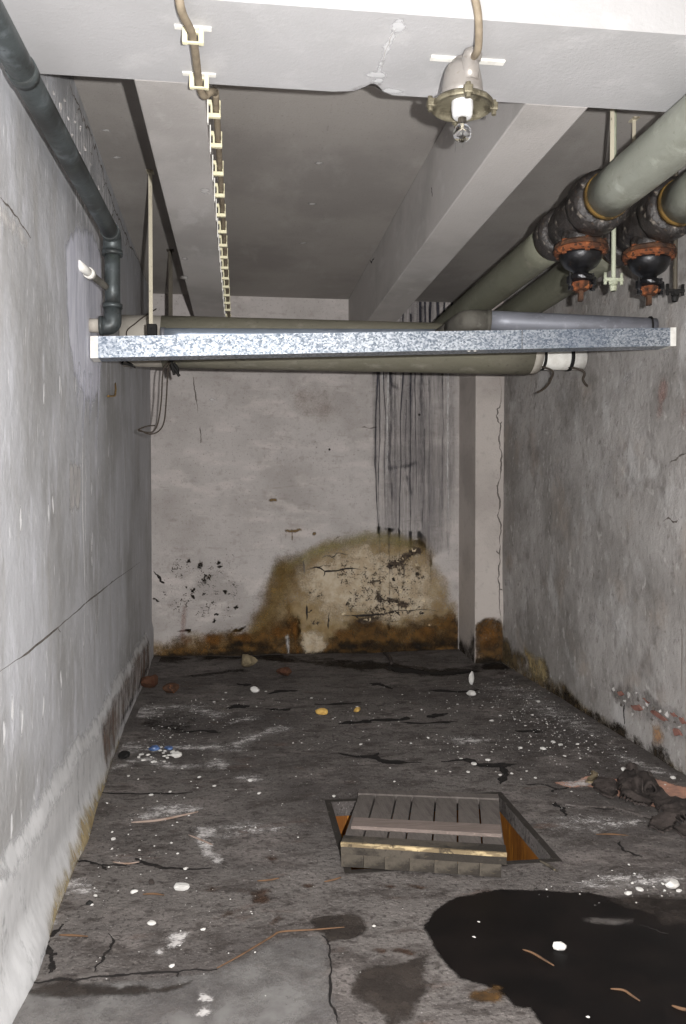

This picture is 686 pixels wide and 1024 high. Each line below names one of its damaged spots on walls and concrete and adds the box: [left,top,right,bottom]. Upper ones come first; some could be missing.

leakage [400,301,453,323]
crack [495,391,503,615]
crack [303,536,356,575]
crack [1,564,165,671]
crack [306,606,439,629]
leakage [0,372,674,1024]
spalling [611,687,686,736]
crack [338,752,652,819]
crack [76,858,211,870]
crack [34,924,217,984]
crack [321,935,338,1023]